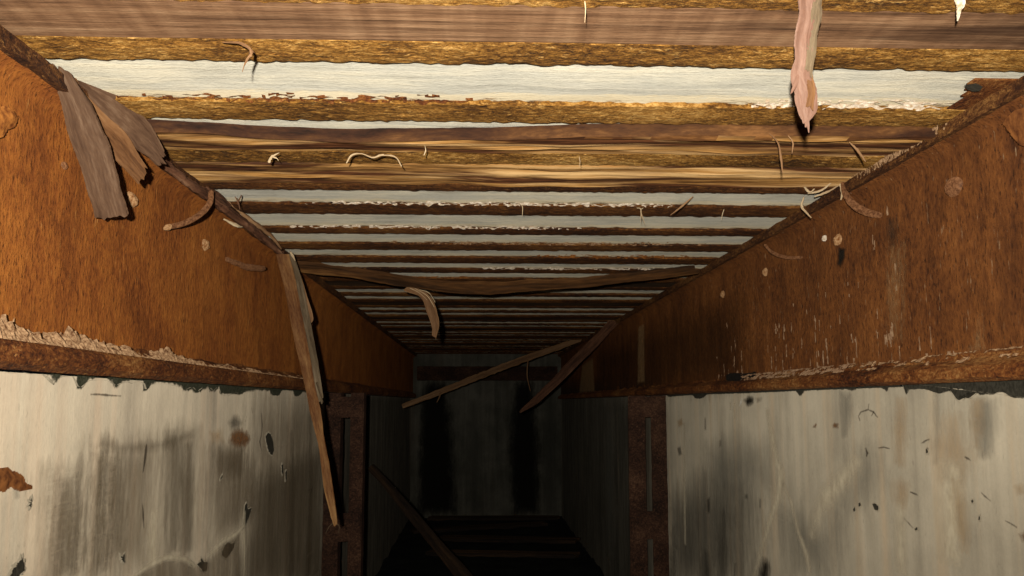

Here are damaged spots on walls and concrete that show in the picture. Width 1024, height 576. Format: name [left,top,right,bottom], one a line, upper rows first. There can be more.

peeling [766,309,840,374]
peeling [876,309,901,360]
corrosion [231,431,249,466]
corrosion [0,467,32,492]
water stain [756,422,783,576]